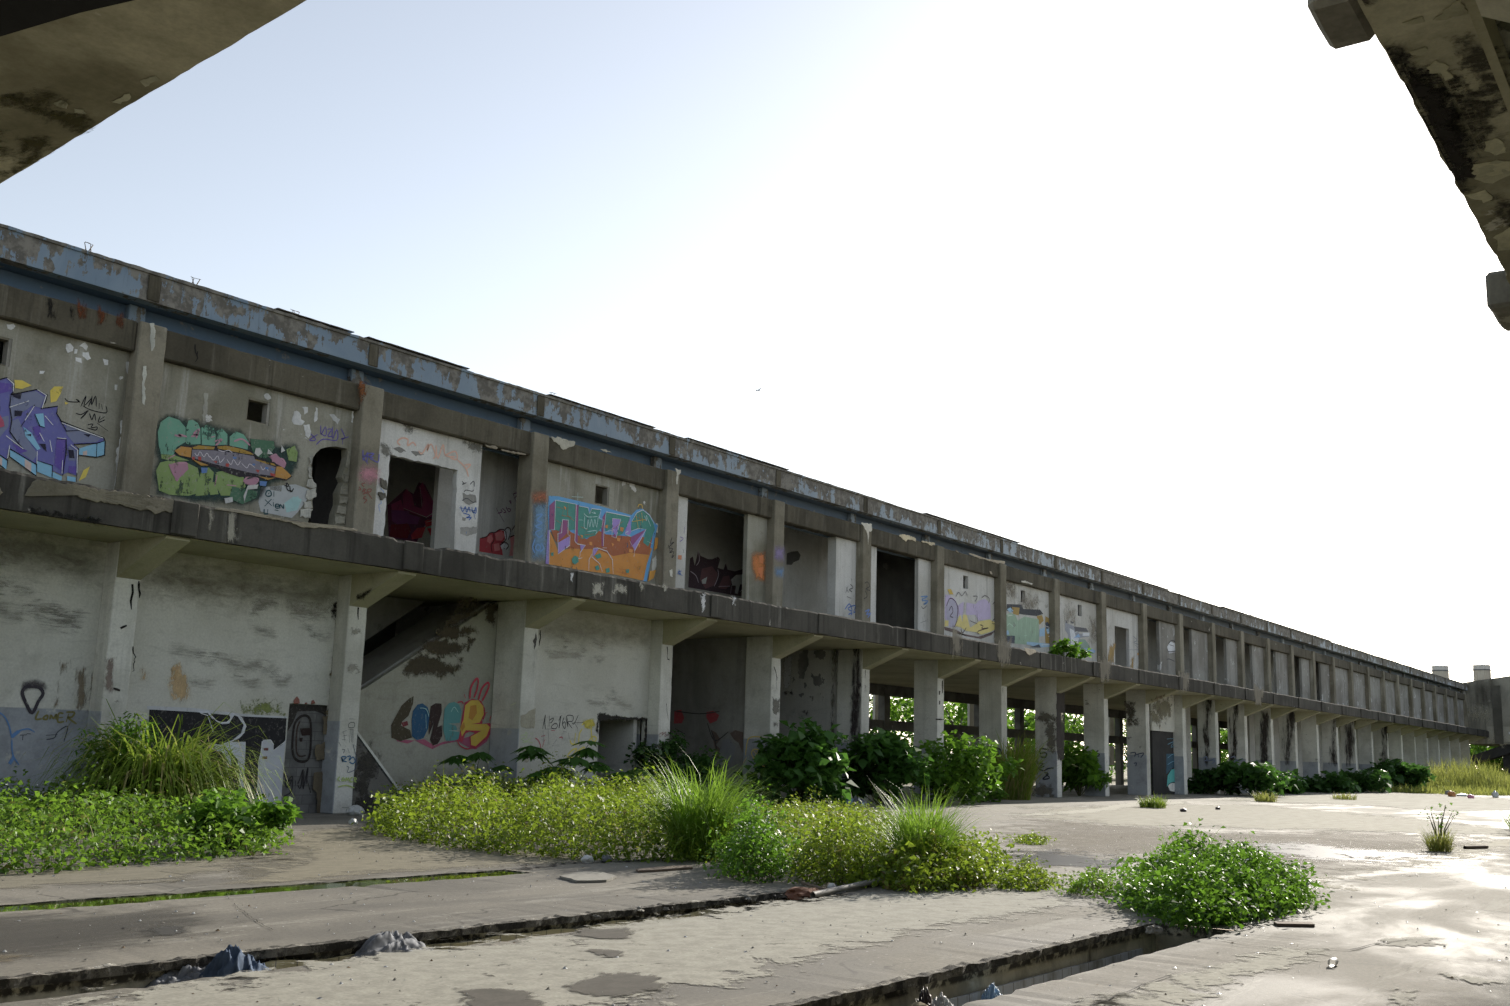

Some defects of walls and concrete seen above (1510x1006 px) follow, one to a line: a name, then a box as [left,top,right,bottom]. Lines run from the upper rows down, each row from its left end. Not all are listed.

mould [0,92,91,177]
leakage [1386,20,1510,193]
peeling [66,342,108,365]
peeling [115,323,156,405]
spalling [215,407,357,531]
spalling [551,436,575,450]
peeling [460,493,478,536]
spalling [899,534,935,546]
leakage [403,597,498,680]